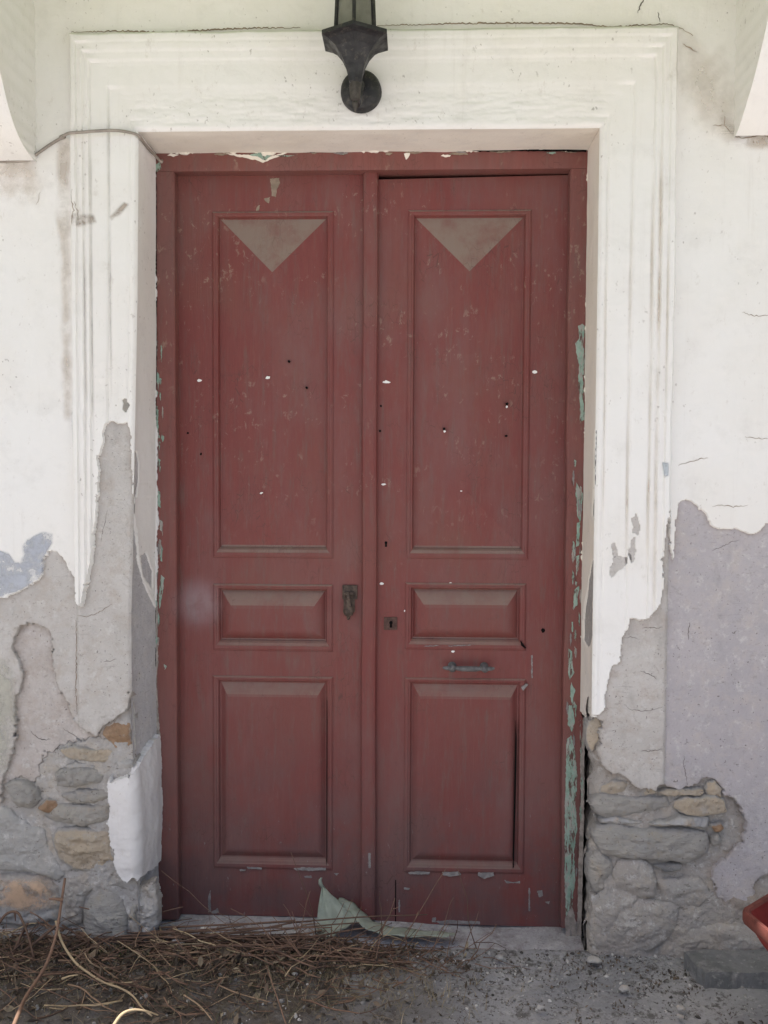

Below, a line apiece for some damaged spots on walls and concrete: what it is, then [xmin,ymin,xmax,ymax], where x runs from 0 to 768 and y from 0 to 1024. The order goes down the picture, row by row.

peeling [156,341,164,468]
flaking render [0,398,173,946]
peeling [564,460,768,964]